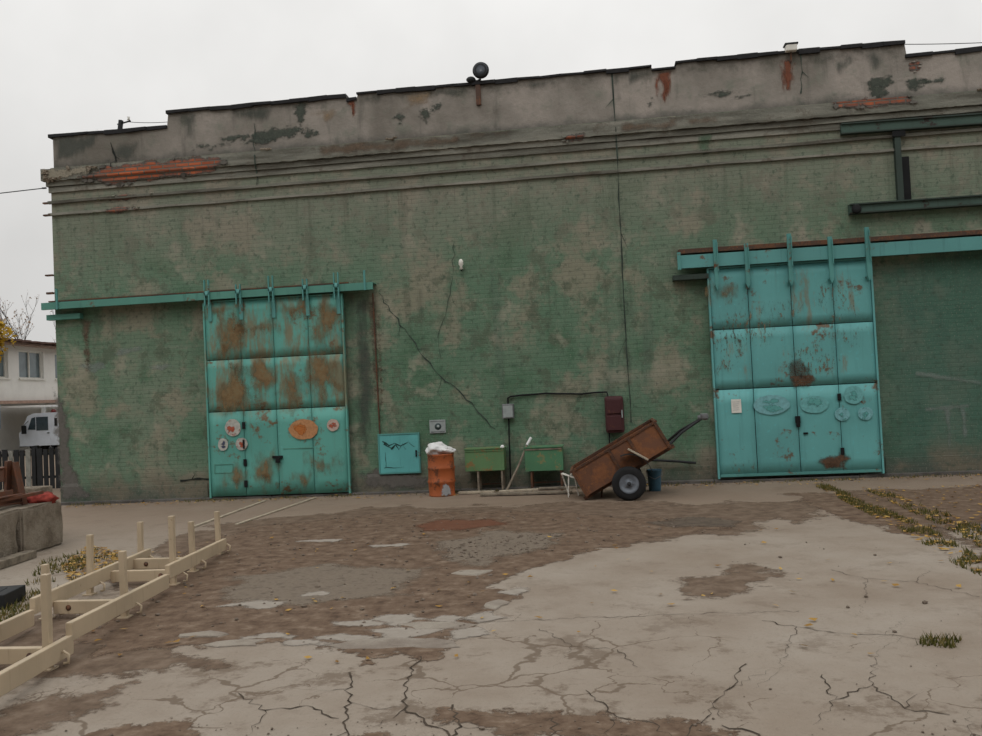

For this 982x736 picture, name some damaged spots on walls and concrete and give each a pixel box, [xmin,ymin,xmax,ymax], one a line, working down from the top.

rust [655,72,670,101]
rust [783,60,792,90]
flaking render [41,156,227,214]
rust [314,303,338,342]
crack [379,241,495,429]
rust [213,300,299,410]
rust [789,344,833,386]
rust [256,460,272,482]
rust [819,455,851,468]